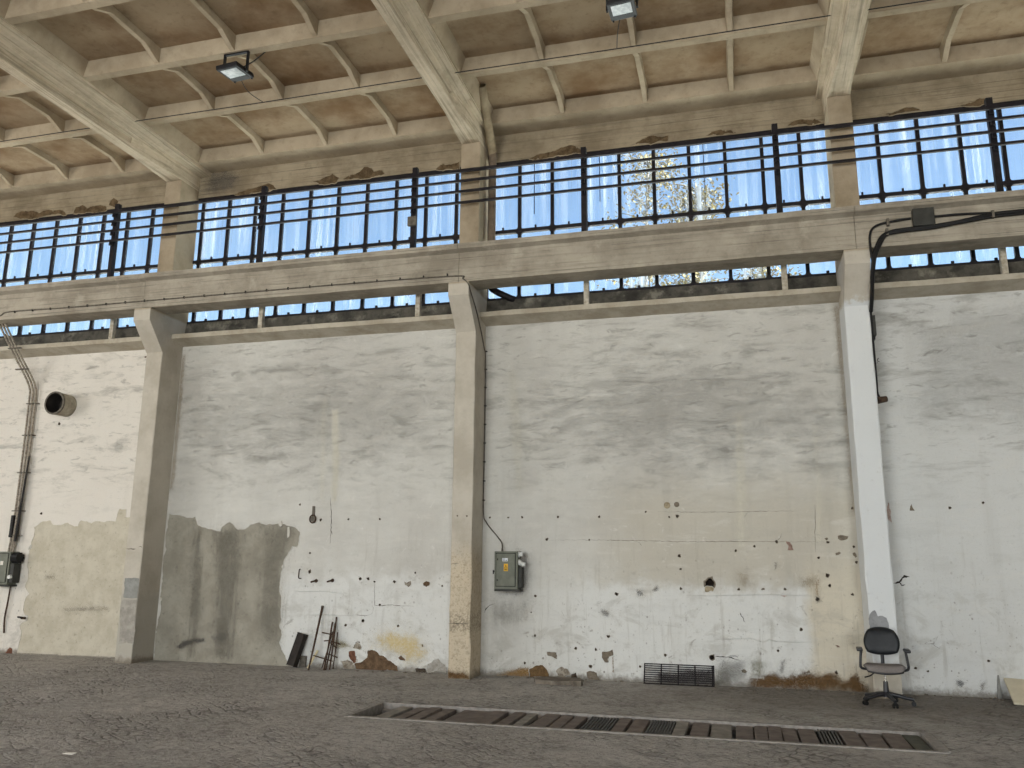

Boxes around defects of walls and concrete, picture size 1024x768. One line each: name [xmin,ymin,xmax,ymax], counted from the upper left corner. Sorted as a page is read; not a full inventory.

spalling [521,144,581,160]
spalling [312,166,385,185]
spalling [13,198,119,220]
peeling [6,508,139,658]
peeling [153,513,311,666]
water stain [183,523,297,664]
spalling [703,576,716,592]
spalling [313,617,447,674]
water stain [368,624,434,666]
spalling [505,635,614,681]